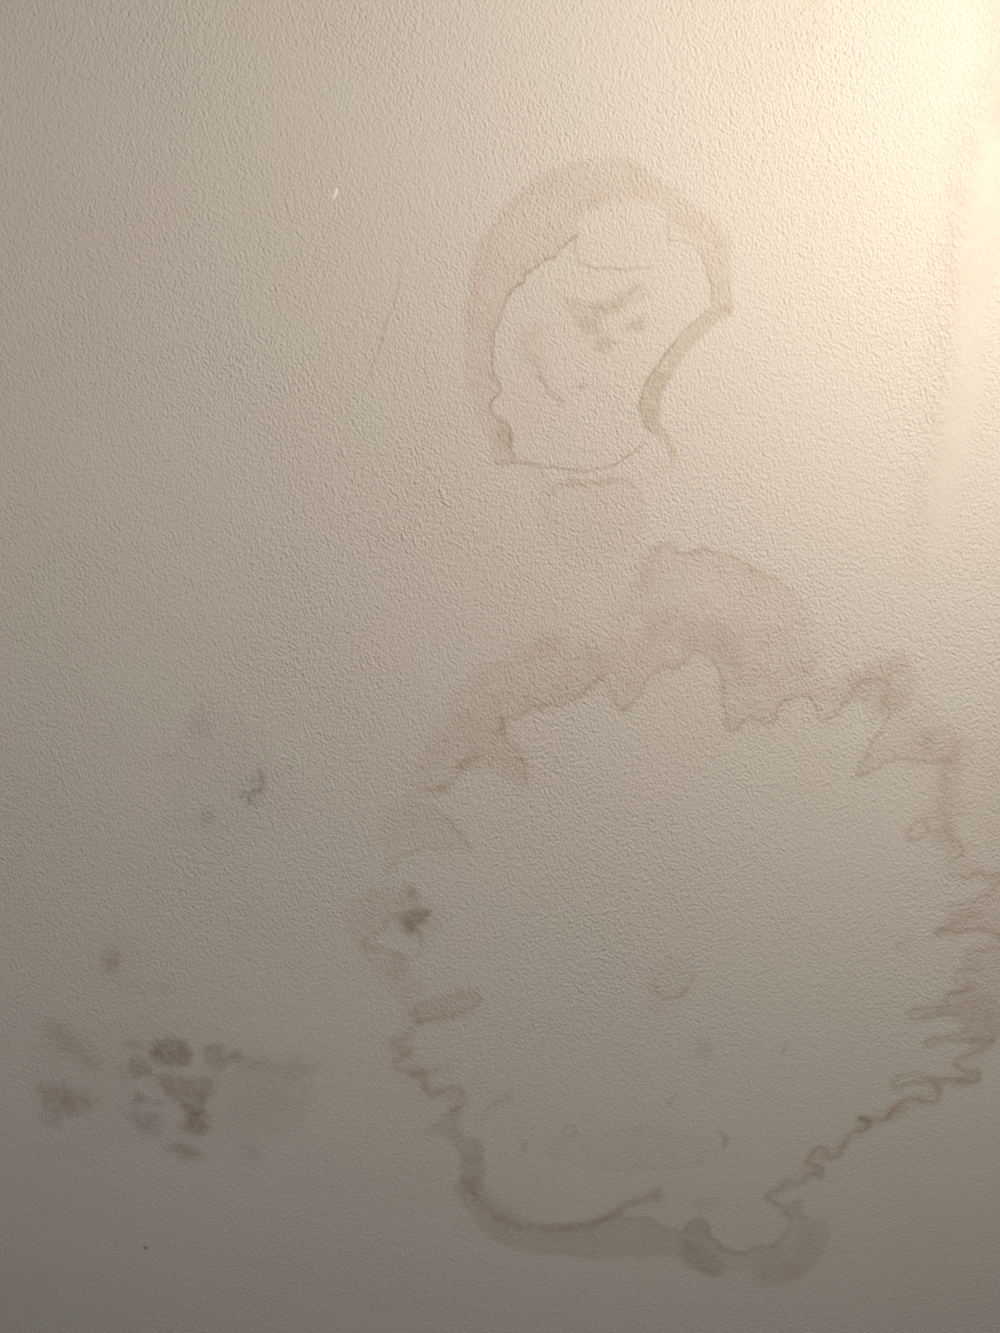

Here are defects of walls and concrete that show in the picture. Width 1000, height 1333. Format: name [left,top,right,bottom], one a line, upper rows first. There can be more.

leakage [21,1013,330,1167]
leakage [337,153,1000,1289]